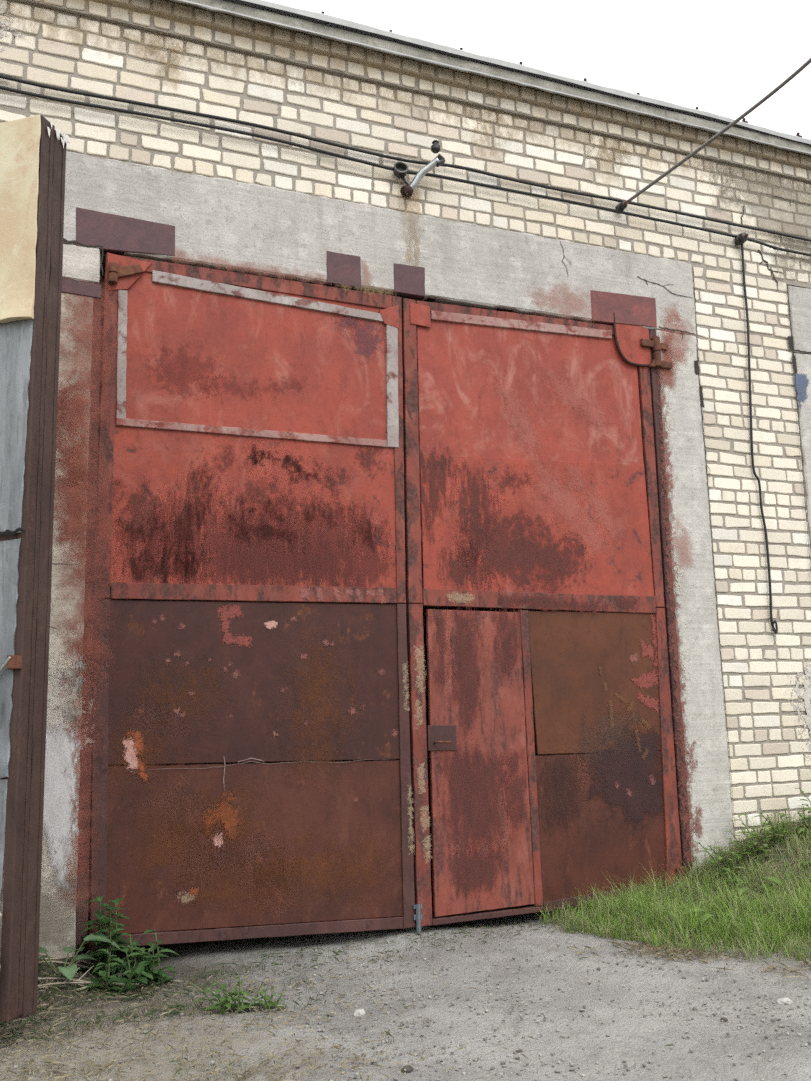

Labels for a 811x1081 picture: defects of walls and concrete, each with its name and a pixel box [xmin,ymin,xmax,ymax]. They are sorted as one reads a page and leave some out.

crack [759,250,811,570]
rust [55,293,109,904]
peeling [217,604,252,648]
rust [116,447,390,587]
rust [419,448,585,593]
crack [637,270,736,832]
water stain [42,724,81,892]
peeling [122,731,148,782]
rust [203,792,243,847]